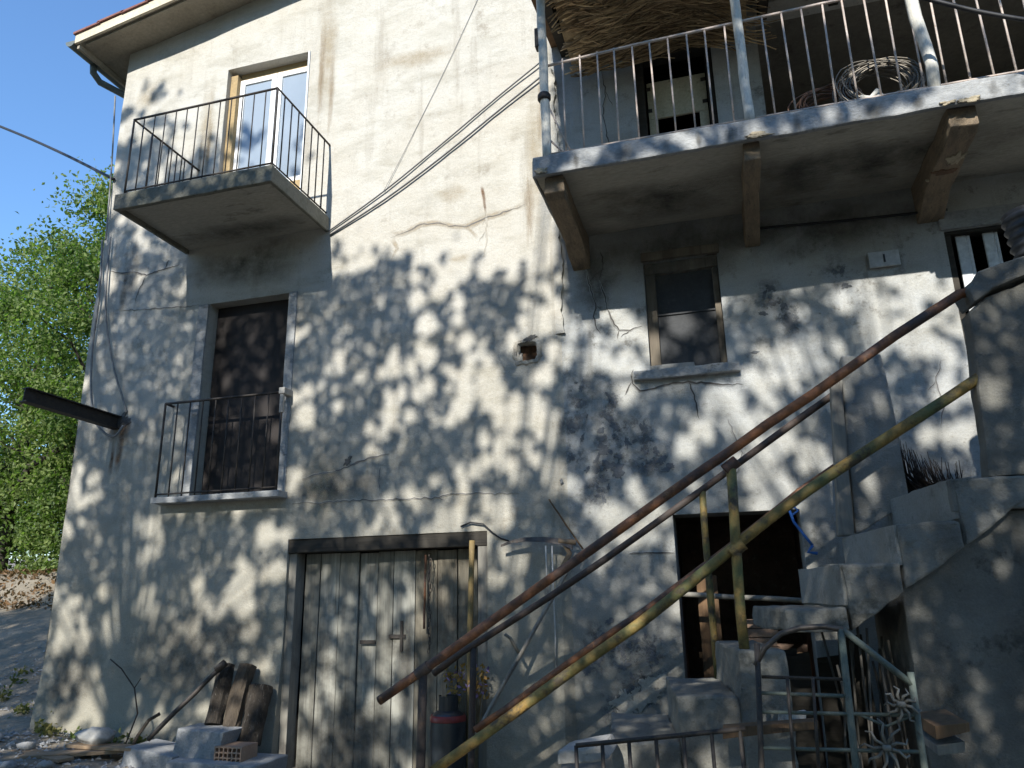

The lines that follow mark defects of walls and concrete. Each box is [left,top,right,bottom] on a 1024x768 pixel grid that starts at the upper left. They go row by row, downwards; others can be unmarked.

crack [393,188,525,256]
crack [585,252,642,339]
spalling [512,334,543,367]
crack [625,371,742,418]